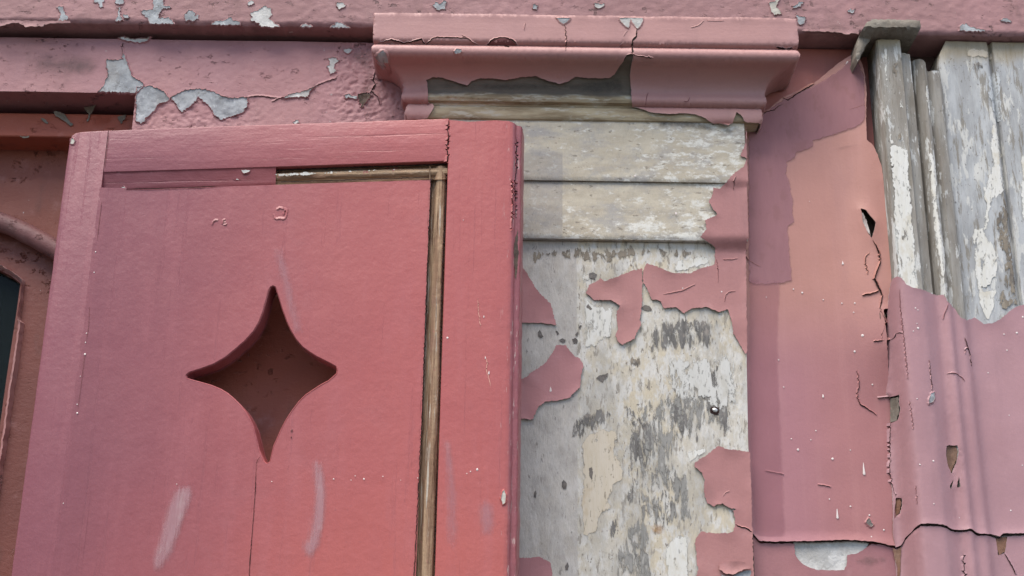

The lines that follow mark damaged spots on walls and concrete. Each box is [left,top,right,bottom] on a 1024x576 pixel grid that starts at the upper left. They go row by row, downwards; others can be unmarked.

peeling [0,6,71,27]
peeling [84,0,280,125]
peeling [330,2,351,30]
peeling [997,199,1017,309]
peeling [514,129,754,576]
crack [735,241,1024,576]
peeling [793,540,869,570]